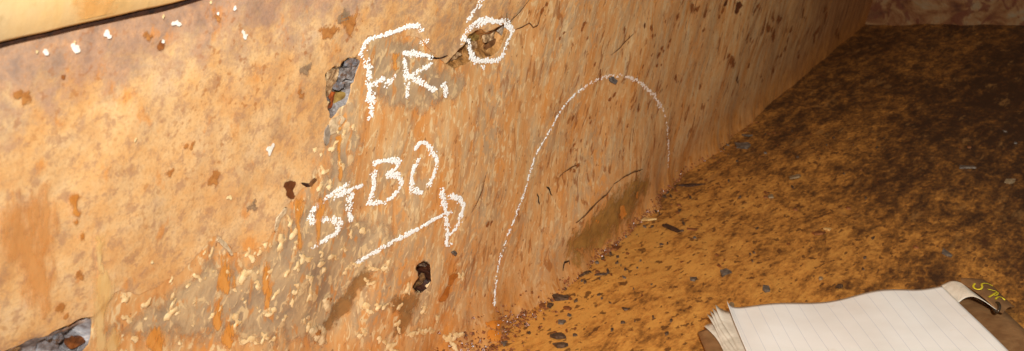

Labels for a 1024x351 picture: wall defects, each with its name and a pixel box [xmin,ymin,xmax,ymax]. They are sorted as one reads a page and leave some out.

peeling [325,23,509,118]
rust [642,0,800,82]
rust [0,0,525,351]
peeling [6,124,394,351]
rust [539,302,572,348]